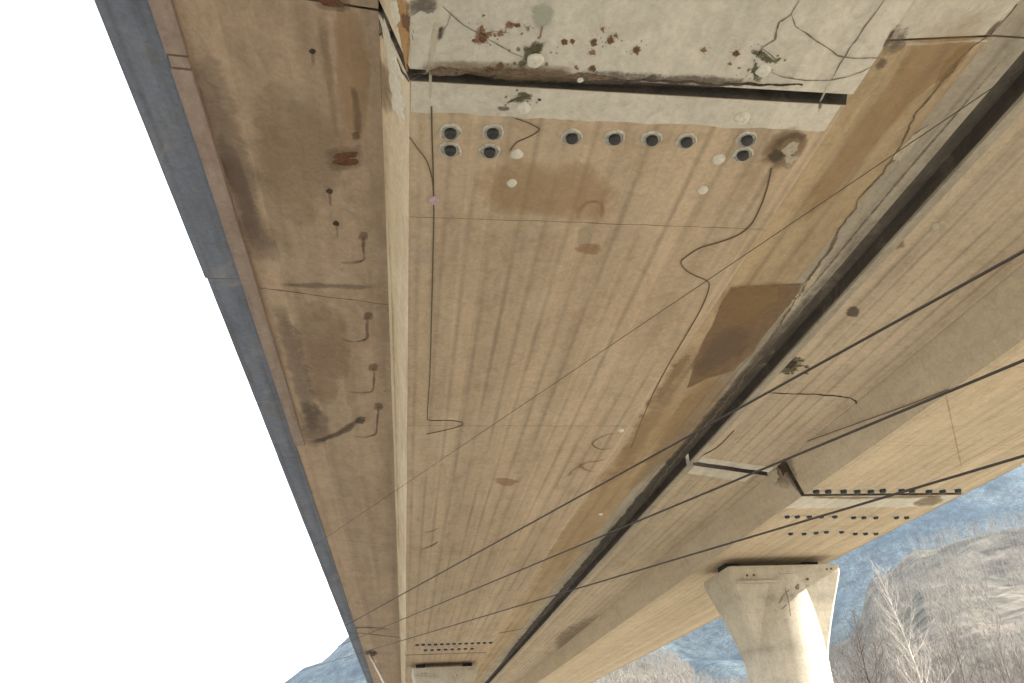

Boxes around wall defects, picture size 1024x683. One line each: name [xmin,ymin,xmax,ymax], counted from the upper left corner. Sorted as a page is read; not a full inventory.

crack [378,10,391,37]
corrosion [470,14,525,47]
corrosion [574,26,647,72]
crack [397,0,885,101]
leakage [505,97,971,658]
crack [776,393,857,404]
leakage [317,417,365,441]